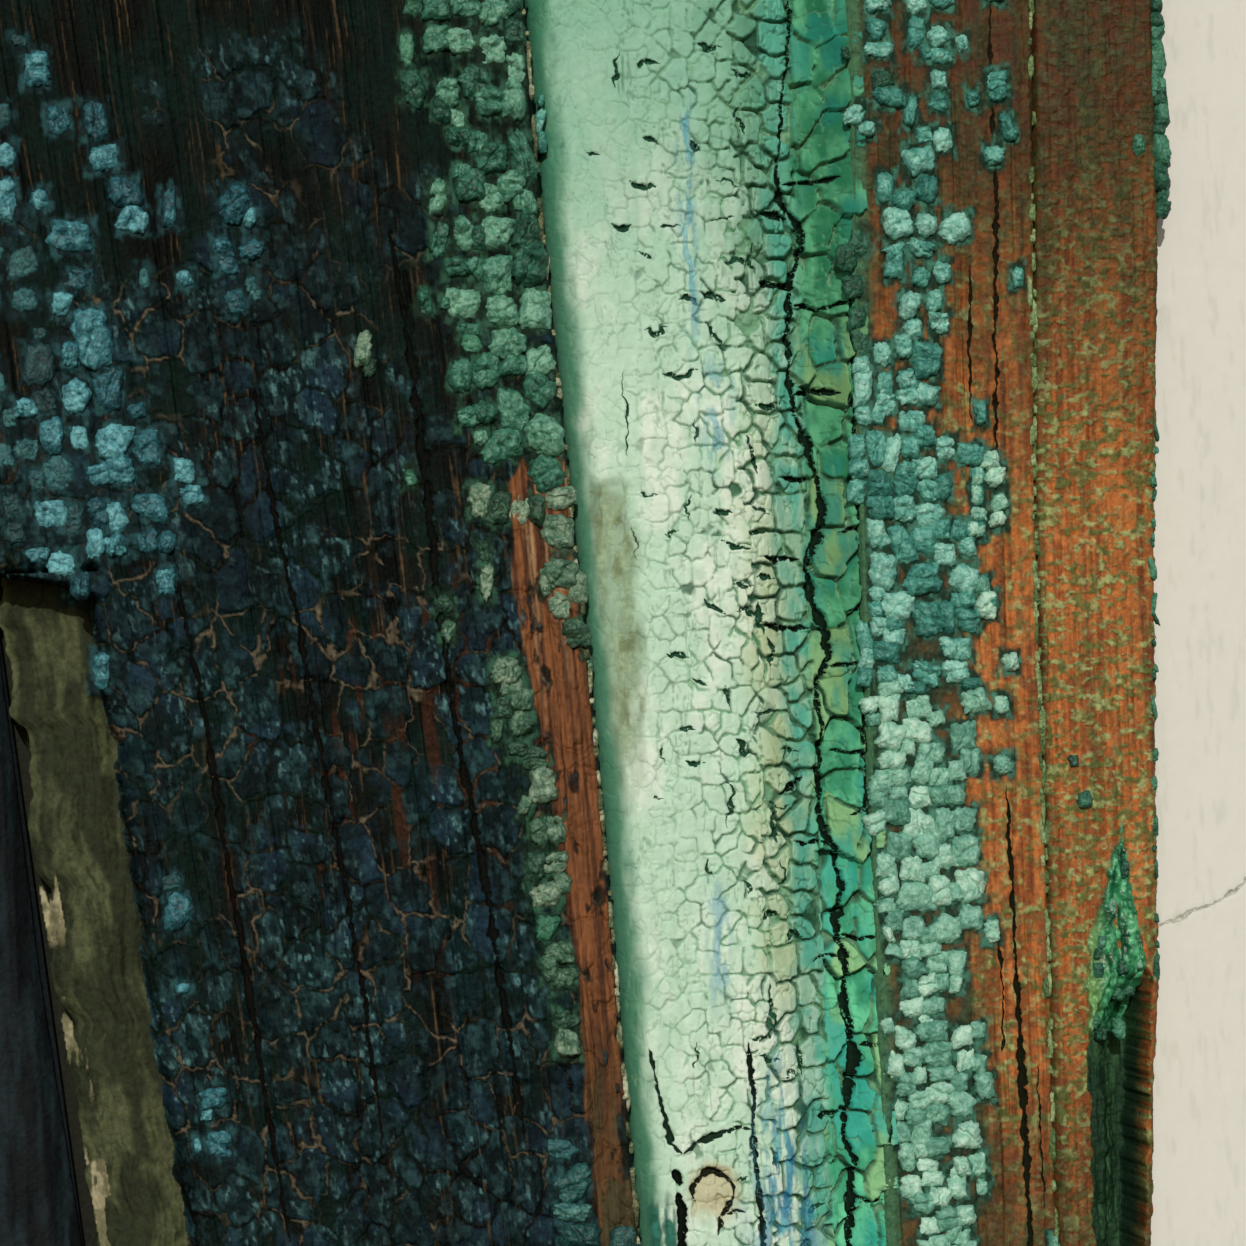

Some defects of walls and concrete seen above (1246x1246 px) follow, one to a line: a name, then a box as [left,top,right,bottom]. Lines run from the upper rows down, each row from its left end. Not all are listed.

peeling [40,876,66,942]
peeling [0,34,210,608]
crack [253,388,385,1149]
crack [388,227,526,1140]
peeling [398,0,641,1246]
crack [621,374,629,455]
crack [612,51,660,87]
crack [611,223,681,259]
crack [629,0,893,1246]
peeling [835,0,1052,1246]
peeling [1085,824,1160,1042]
peeling [1131,0,1172,220]